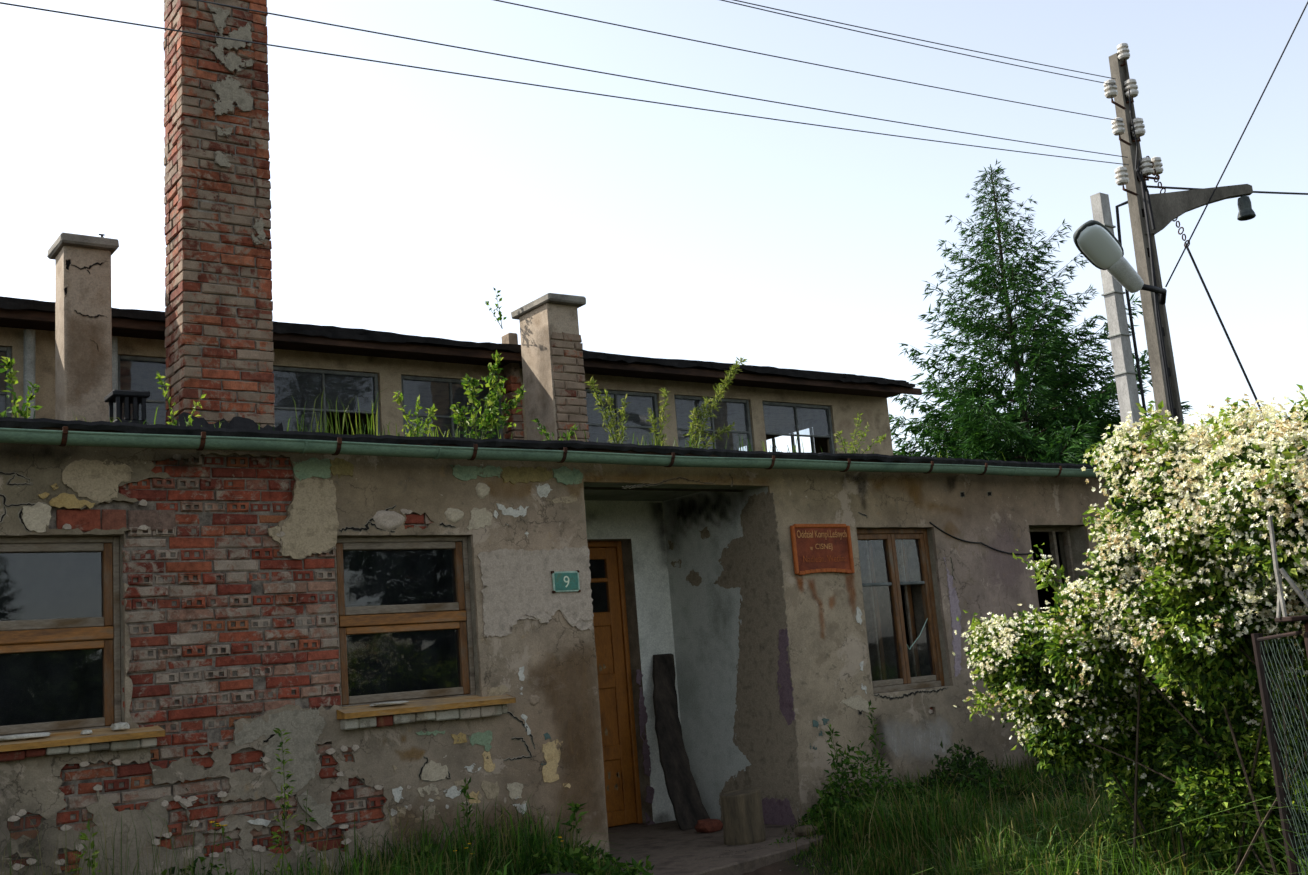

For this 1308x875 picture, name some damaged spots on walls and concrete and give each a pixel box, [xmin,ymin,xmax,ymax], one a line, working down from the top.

peeling [207,3,256,168]
crack [70,260,108,275]
peeling [250,217,266,246]
crack [74,310,107,352]
flaking render [5,454,527,875]
peeling [521,714,571,788]